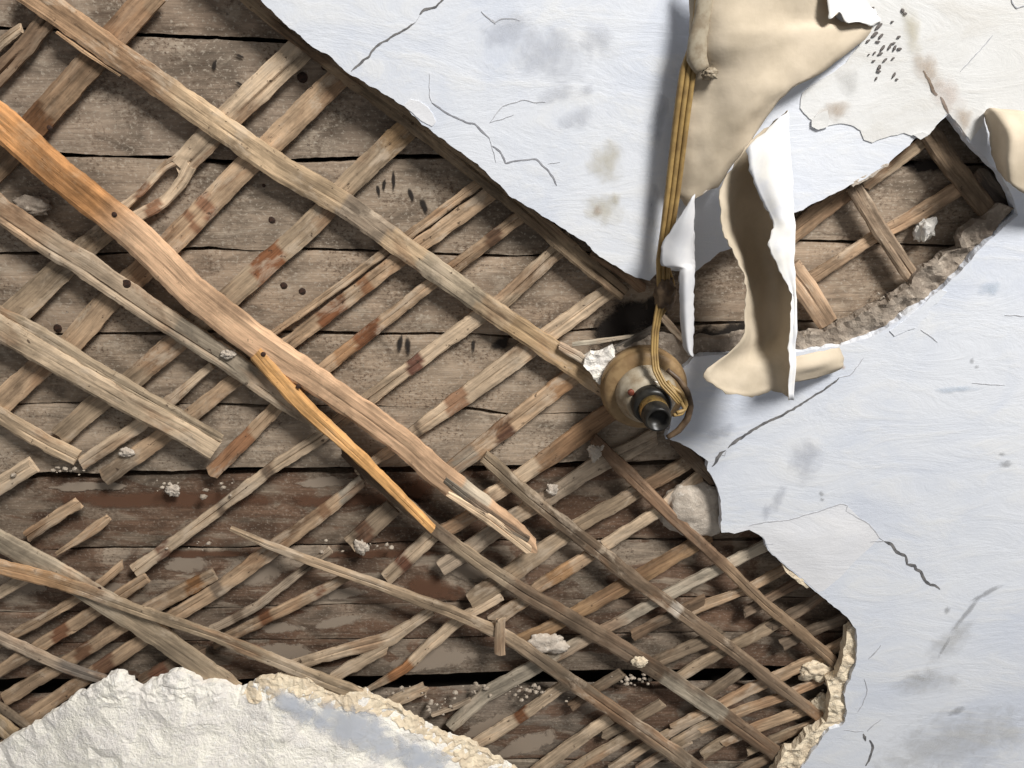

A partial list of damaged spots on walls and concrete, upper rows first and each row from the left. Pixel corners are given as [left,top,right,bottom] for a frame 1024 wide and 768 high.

crack [351,0,443,71]
peeling [404,99,436,126]
crack [429,74,559,185]
flaking render [583,329,745,385]
crack [712,359,863,467]
flaking render [781,563,809,588]
crack [749,504,940,589]
flaking render [242,672,517,768]
flaking render [769,621,856,768]